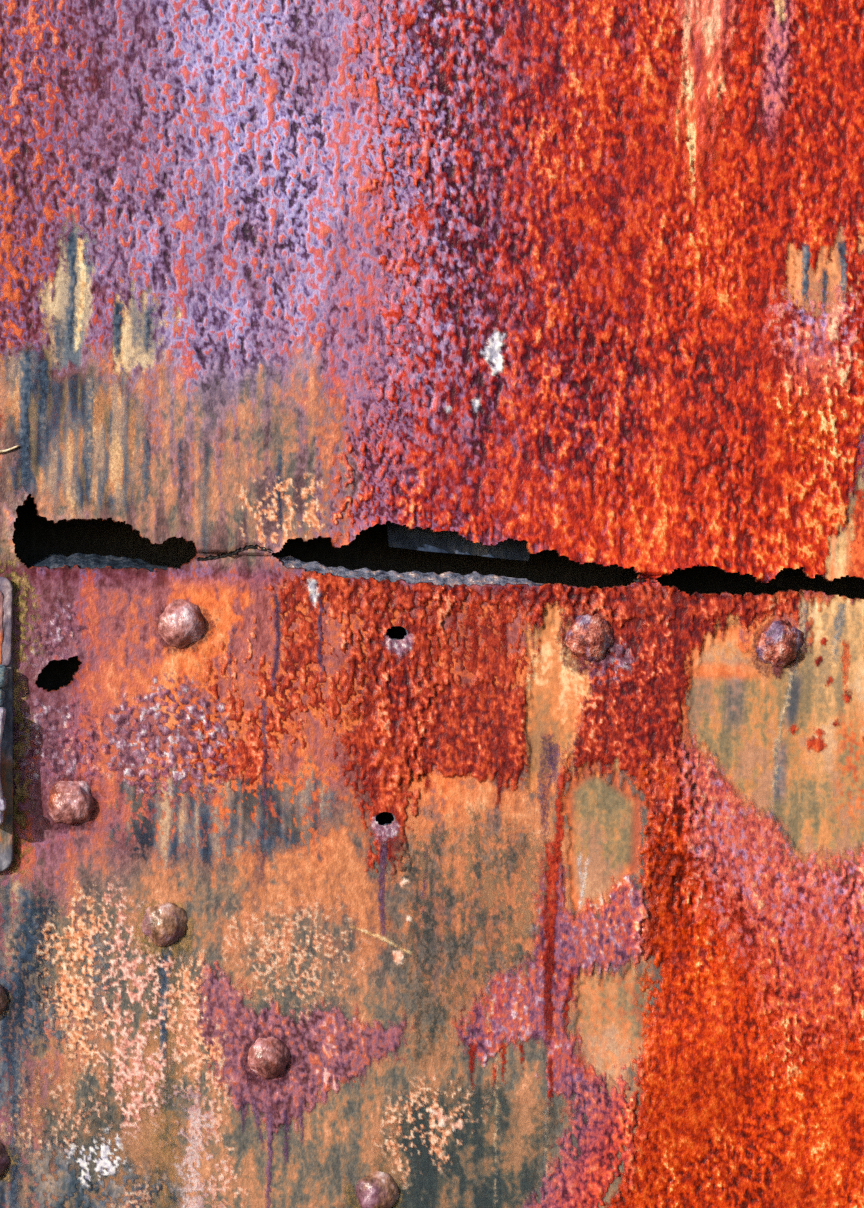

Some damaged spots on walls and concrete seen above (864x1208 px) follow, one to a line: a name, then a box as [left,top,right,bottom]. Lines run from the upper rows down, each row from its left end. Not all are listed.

rust [0,150,50,335]
crack [12,494,864,600]
rust [190,0,864,1208]
peeling [684,469,864,857]